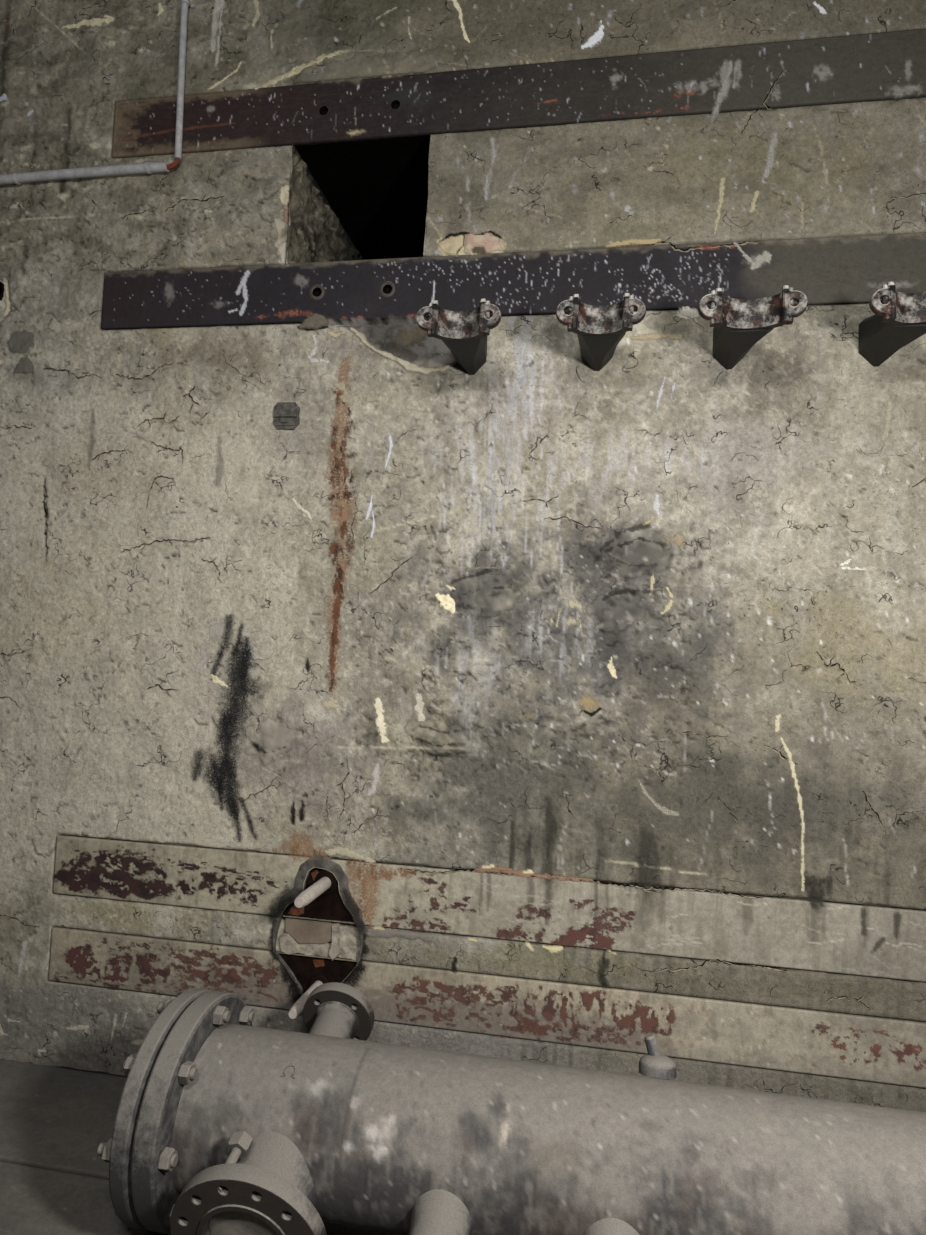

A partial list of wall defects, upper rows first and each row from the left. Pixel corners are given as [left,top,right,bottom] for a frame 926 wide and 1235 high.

flaking render [435,229,507,256]
flaking render [0,278,11,322]
crack [42,363,173,381]
crack [92,386,199,508]
crack [41,485,49,561]
rust [327,357,355,692]
crack [121,537,221,582]
crack [370,557,413,594]
crack [147,680,180,697]
crack [326,758,388,833]
water stain [510,798,553,881]